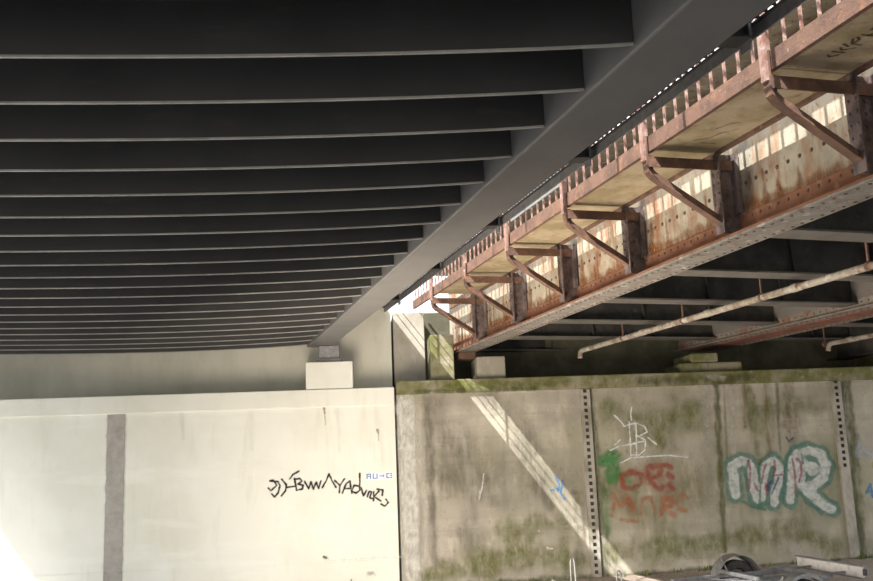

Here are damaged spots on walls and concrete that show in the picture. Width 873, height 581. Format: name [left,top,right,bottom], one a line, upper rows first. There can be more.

corrosion [746,164,841,212]
damp [703,385,727,552]
damp [849,413,864,554]